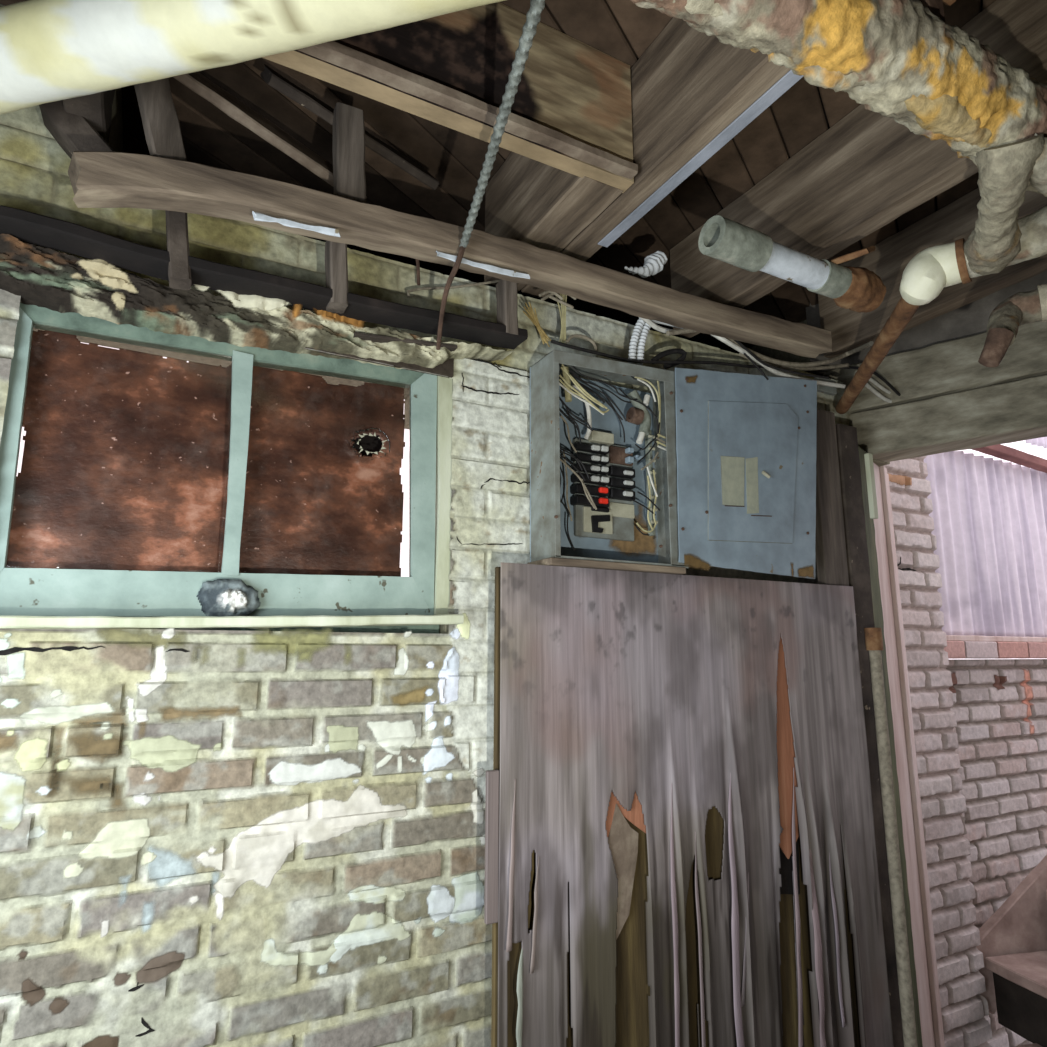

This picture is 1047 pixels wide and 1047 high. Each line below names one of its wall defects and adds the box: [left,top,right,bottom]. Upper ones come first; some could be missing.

peeling [72,259,137,309]
peeling [194,284,290,311]
crack [481,478,530,489]
peeling [0,633,25,682]
crack [0,646,105,655]
peeling [1,689,200,780]
flaking render [0,729,70,839]
peeling [64,613,470,920]
peeling [261,872,484,974]
spalling [114,951,185,986]
spalling [22,979,69,1014]
spalling [82,1035,119,1047]